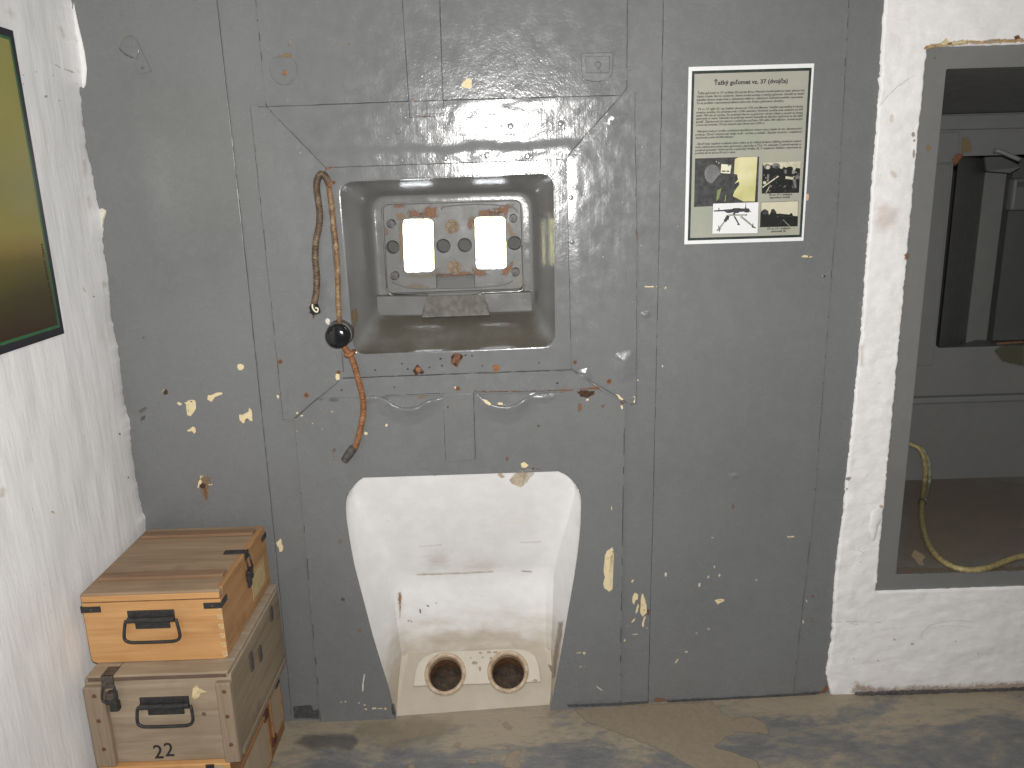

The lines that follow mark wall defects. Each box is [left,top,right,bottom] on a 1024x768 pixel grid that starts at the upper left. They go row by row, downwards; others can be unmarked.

corrosion [394,204,438,218]
corrosion [468,203,510,230]
corrosion [451,353,463,367]
peeling [177,392,222,433]
peeling [239,408,253,423]
spalling [498,462,539,487]
peeling [603,548,614,591]
peeling [624,580,650,641]